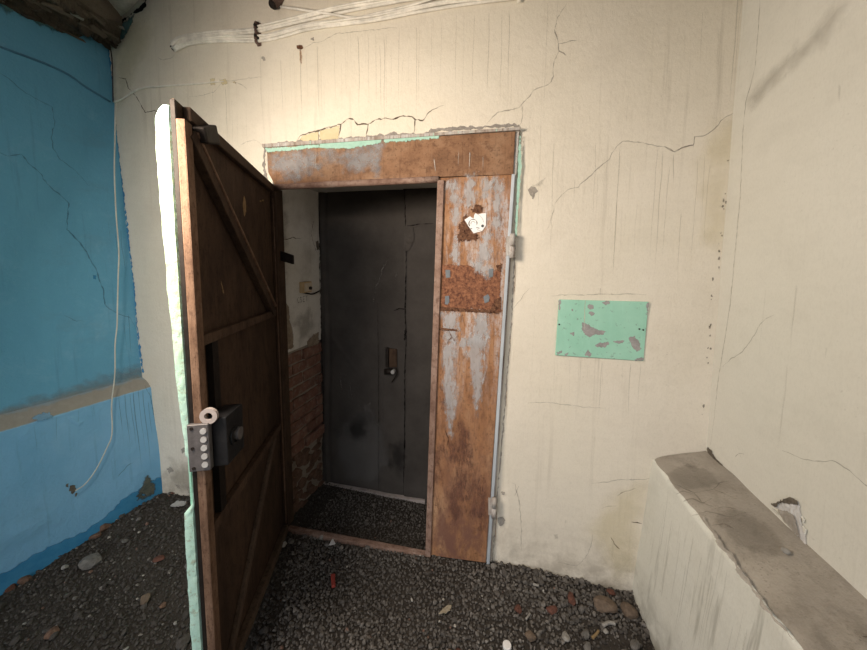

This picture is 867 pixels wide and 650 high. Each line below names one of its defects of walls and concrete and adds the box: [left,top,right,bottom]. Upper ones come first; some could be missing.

crack [298,107,438,139]
corrosion [457,204,485,242]
corrosion [440,264,502,314]
spalling [262,123,538,561]